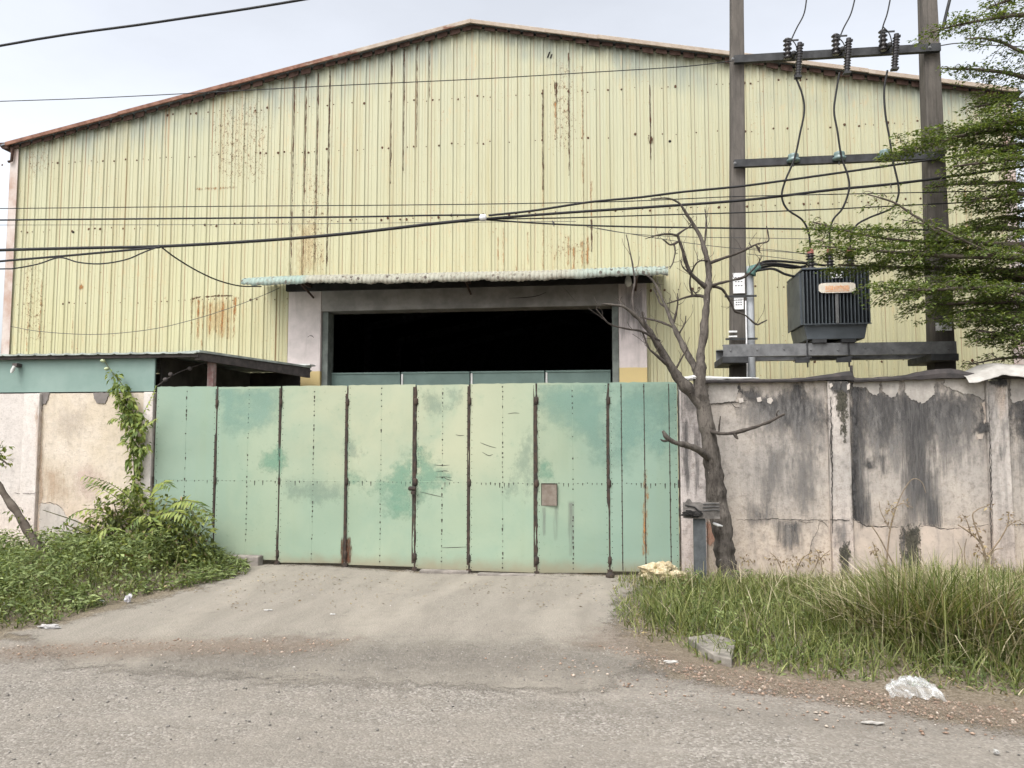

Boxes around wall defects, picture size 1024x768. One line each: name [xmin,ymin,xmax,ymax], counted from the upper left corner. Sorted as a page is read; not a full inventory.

rust [213,97,274,189]
rust [290,70,340,276]
rust [542,53,584,201]
rust [543,172,598,267]
rust [191,295,236,337]
flaking render [708,383,744,404]
damp [737,382,828,444]
crack [739,400,1024,564]
damp [840,386,989,528]
flaking render [847,379,988,439]
damp [990,378,1024,438]
rust [341,537,352,564]